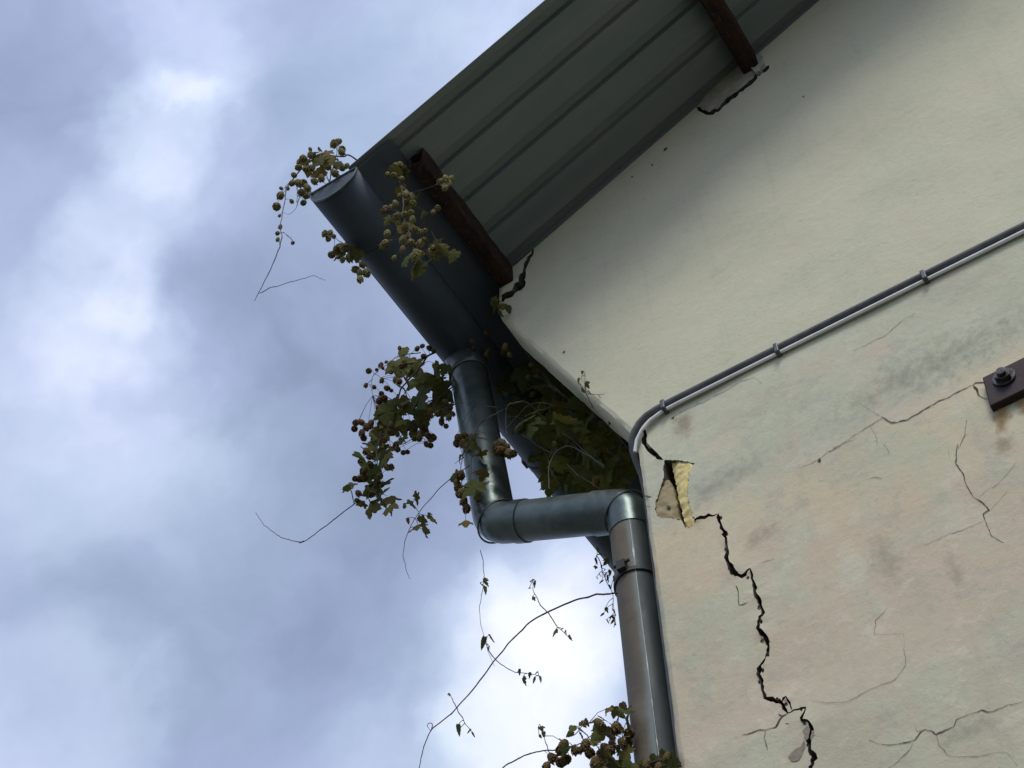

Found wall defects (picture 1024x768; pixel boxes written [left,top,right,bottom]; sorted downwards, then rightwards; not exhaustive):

crack [697,65,769,115]
crack [497,248,534,310]
crack [882,382,987,424]
crack [642,430,663,460]
spalling [655,460,698,528]
crack [955,420,1002,542]
crack [696,513,818,768]
crack [869,701,1022,745]